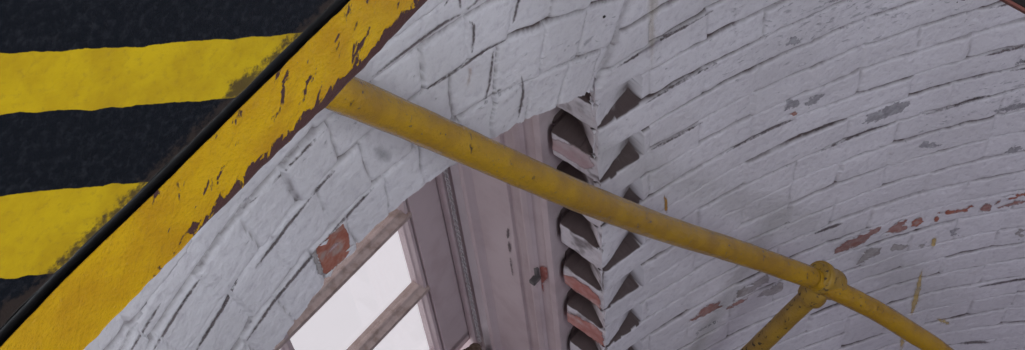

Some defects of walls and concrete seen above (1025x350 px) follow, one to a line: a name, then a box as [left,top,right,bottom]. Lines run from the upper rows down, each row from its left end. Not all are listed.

flaking render [312,224,356,277]
peeling [834,193,1025,264]
flaking render [563,275,601,309]
flaking render [567,312,604,346]